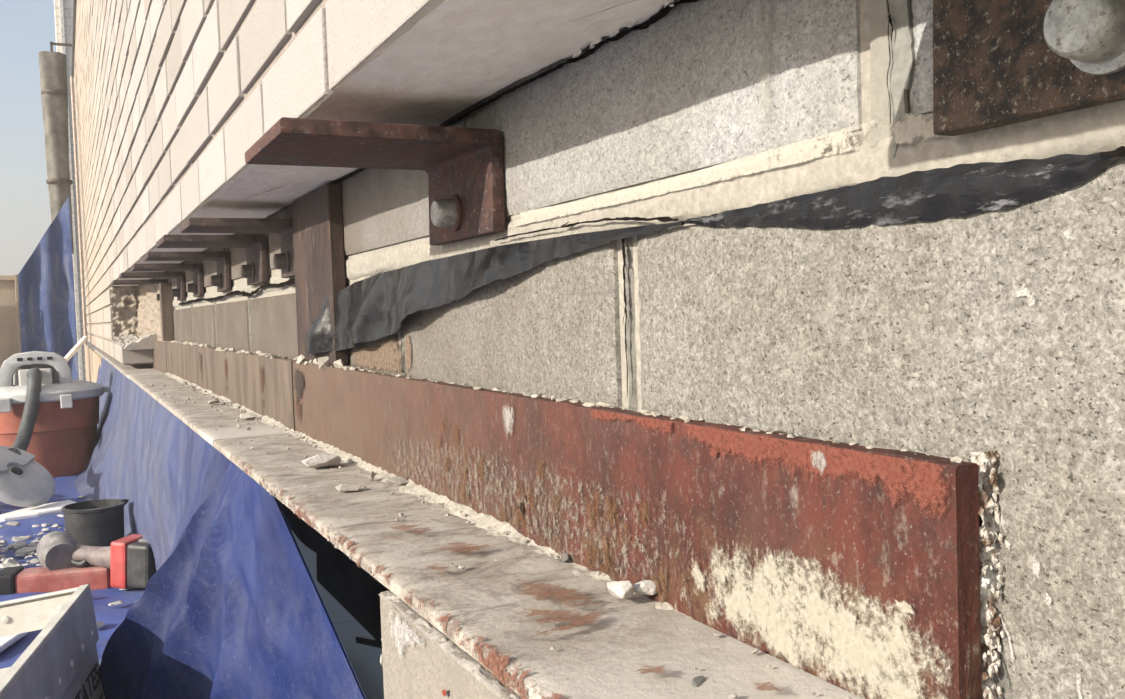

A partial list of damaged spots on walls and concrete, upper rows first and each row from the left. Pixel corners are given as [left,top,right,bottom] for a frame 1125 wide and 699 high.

crack [442,0,699,127]
crack [886,0,894,124]
crack [334,168,366,183]
rust [230,456,391,584]
rust [436,542,490,555]
rust [404,590,572,699]
rust [511,579,604,635]
rust [638,665,665,674]
leakage [383,436,950,699]
rust [754,682,782,691]